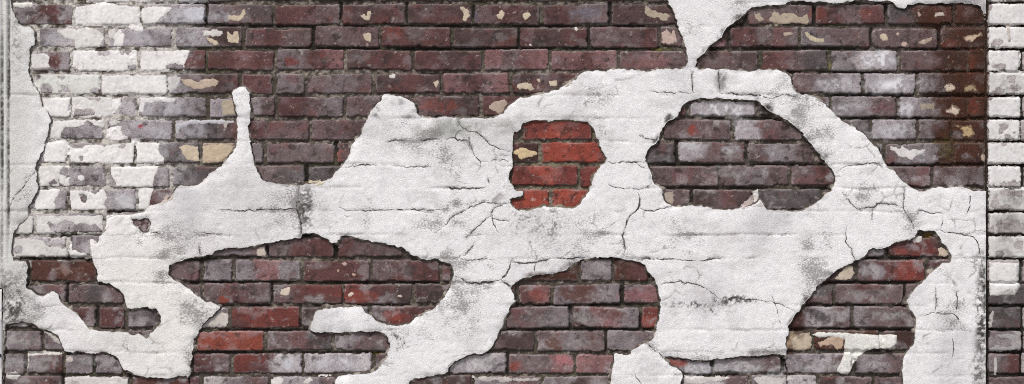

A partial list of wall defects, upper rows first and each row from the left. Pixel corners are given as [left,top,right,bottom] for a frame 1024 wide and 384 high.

spalling [1,233,454,384]
spalling [11,0,688,339]
crack [344,124,580,287]
spalling [409,257,661,384]
crack [608,138,784,322]
spalling [645,97,835,212]
spalling [664,230,952,384]
spalling [695,0,1024,296]
crack [848,194,982,262]
peeling [988,310,1020,375]